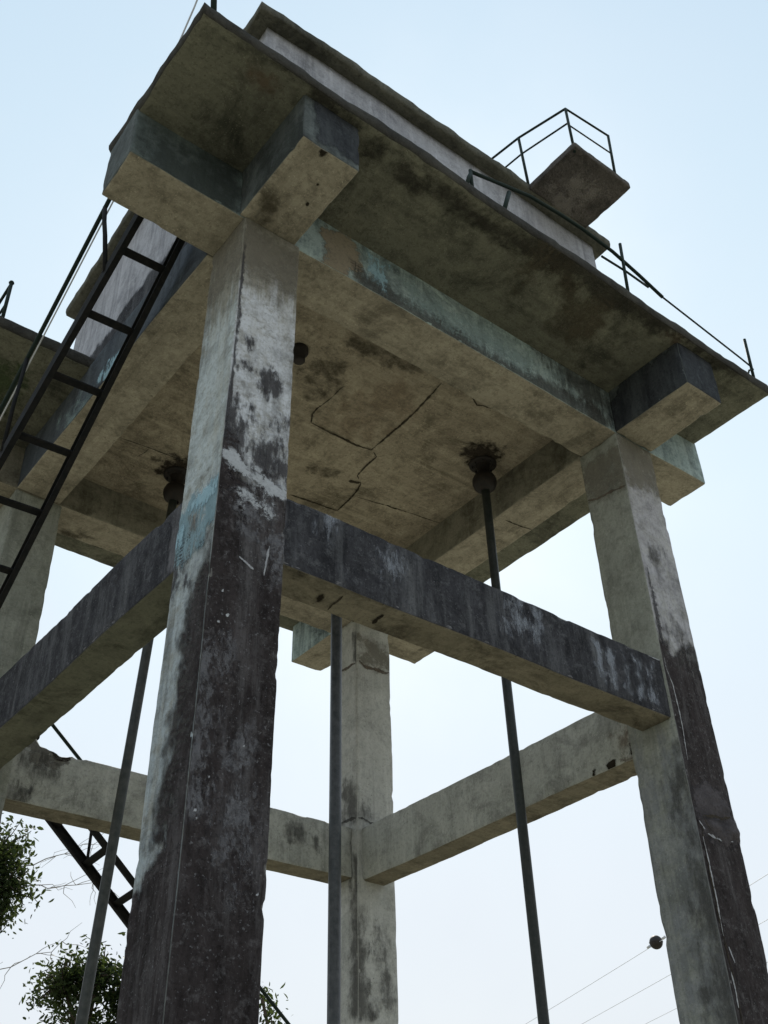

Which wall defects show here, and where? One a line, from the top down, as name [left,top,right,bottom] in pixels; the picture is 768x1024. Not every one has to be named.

crack [292,384,441,523]
leakage [0,220,768,1024]
leakage [353,165,739,504]